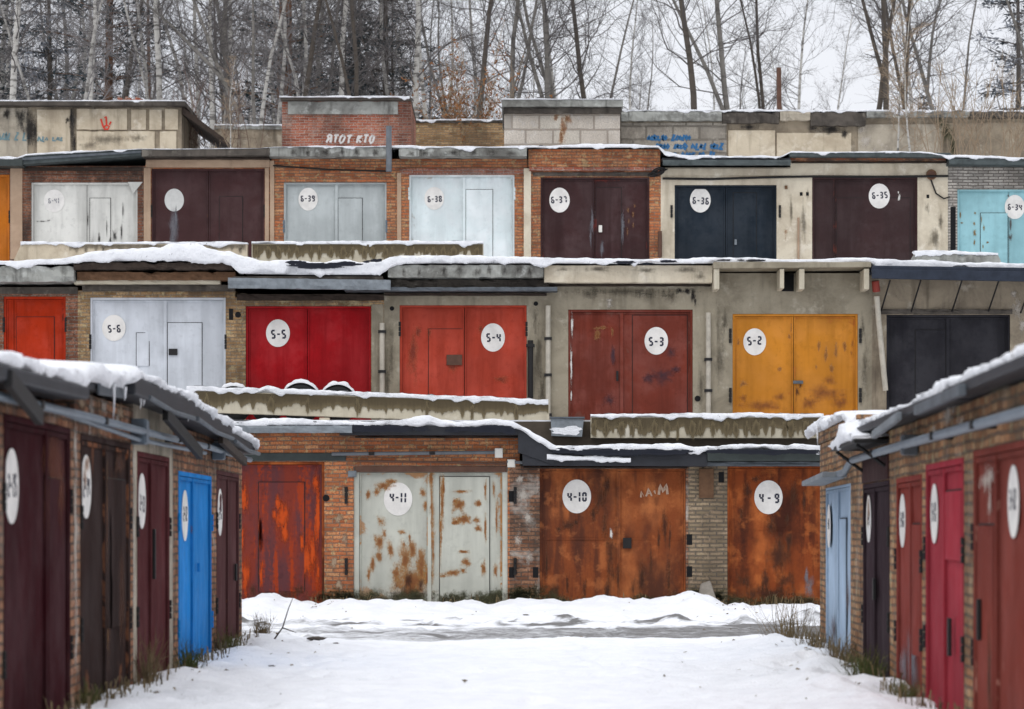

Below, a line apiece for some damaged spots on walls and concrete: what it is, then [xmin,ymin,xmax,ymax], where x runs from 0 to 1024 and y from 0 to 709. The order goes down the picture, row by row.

water stain [195,353,548,420]
water stain [591,418,820,440]
rust [366,472,498,600]
rust [592,480,619,596]
rust [739,515,795,599]